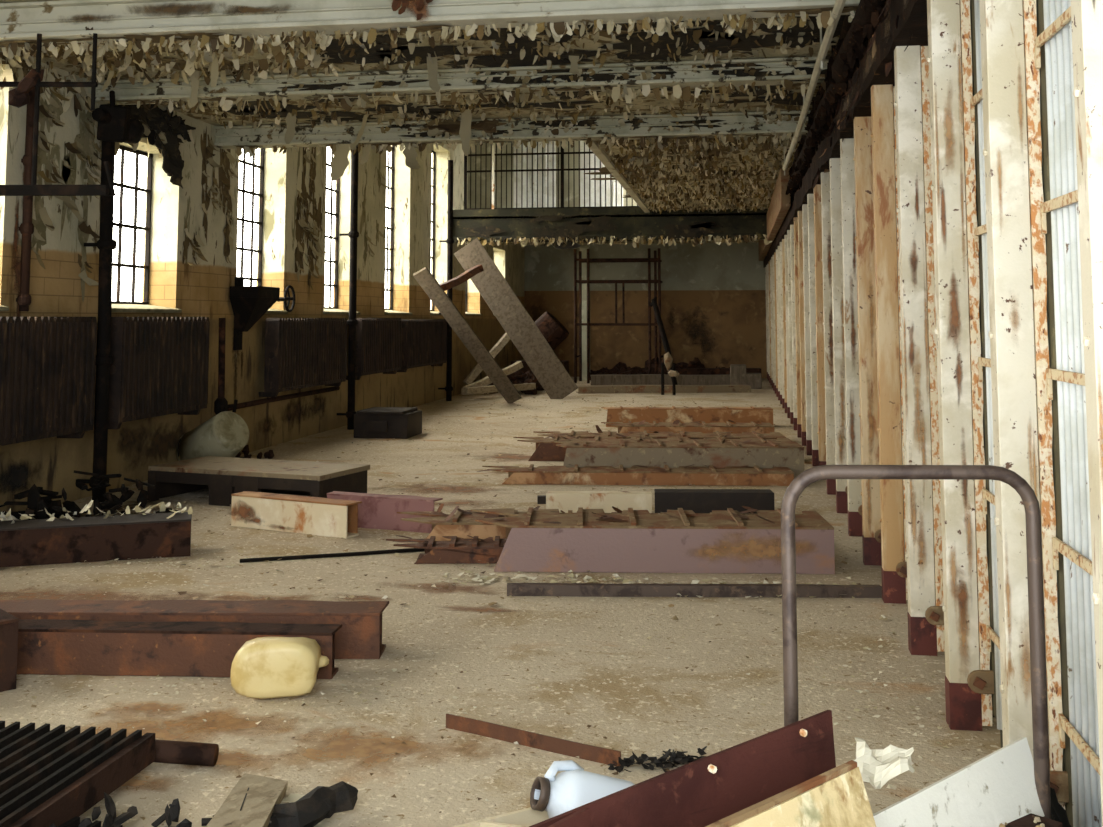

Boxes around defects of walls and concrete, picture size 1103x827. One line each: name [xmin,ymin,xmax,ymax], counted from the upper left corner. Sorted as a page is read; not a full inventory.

peeling [0,6,858,302]